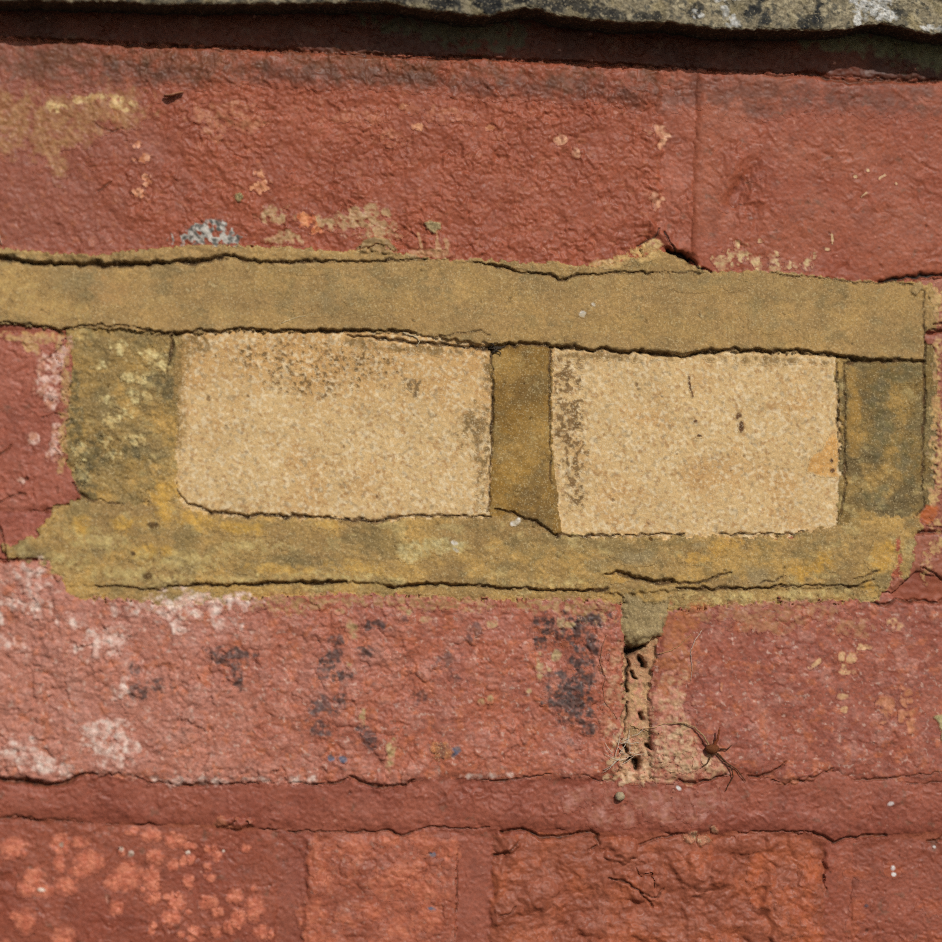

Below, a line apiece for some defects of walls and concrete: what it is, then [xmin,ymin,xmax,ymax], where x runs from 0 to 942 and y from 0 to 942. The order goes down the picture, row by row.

peeling [166,217,248,248]
peeling [356,236,399,255]
peeling [26,335,74,463]
spalling [806,432,840,479]
peeling [598,597,737,799]